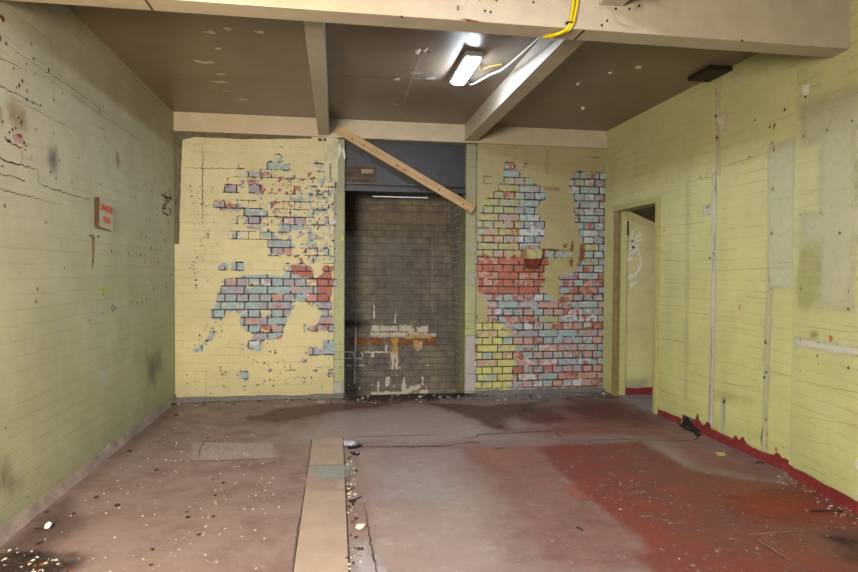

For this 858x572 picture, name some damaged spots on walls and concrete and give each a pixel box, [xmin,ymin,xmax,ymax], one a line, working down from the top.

crack [0,47,143,143]
crack [0,151,88,205]
peeling [188,154,337,394]
peeling [473,161,606,390]
peeling [370,324,436,339]
crack [688,312,760,422]
crack [354,430,567,449]